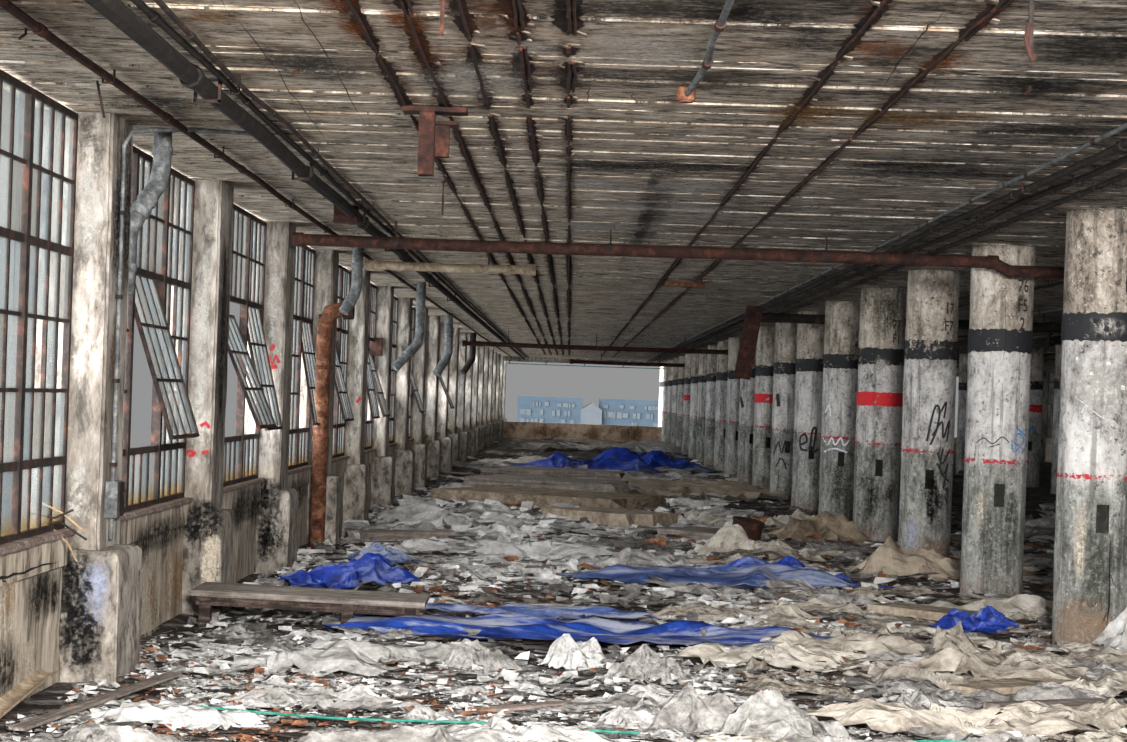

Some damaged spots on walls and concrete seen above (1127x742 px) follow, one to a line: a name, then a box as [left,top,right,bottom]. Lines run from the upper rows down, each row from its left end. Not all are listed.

damp [990,24,1127,99]
damp [233,484,283,561]
damp [1074,507,1124,605]
damp [0,558,108,696]